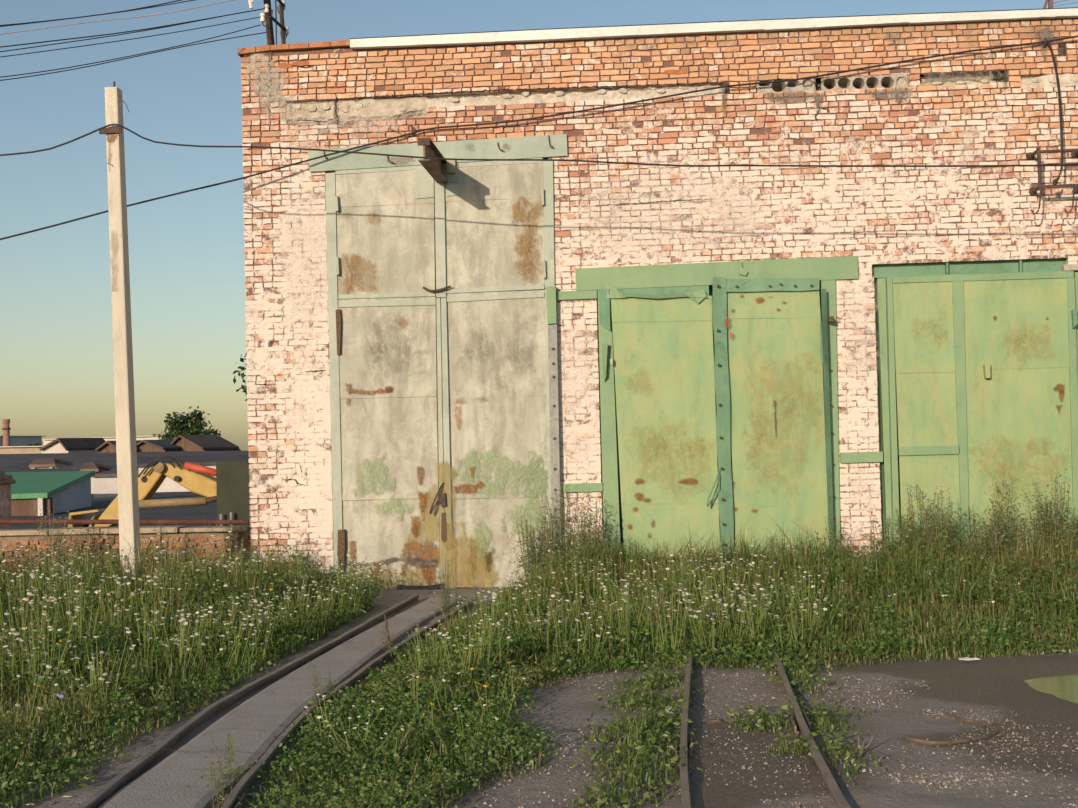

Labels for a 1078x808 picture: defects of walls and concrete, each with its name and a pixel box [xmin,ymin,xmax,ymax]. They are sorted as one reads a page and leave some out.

spalling [277,61,309,69]
spalling [285,69,729,123]
corrosion [346,384,393,404]
corrosion [455,468,484,493]
corrosion [348,466,439,585]